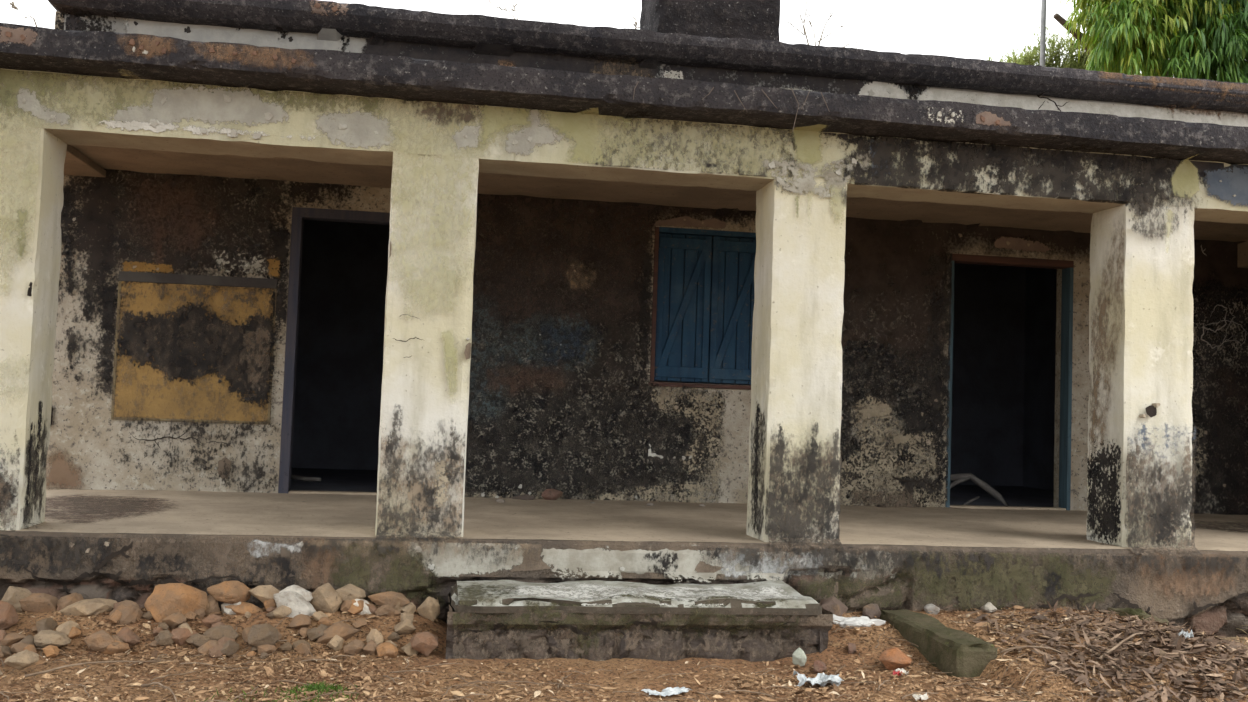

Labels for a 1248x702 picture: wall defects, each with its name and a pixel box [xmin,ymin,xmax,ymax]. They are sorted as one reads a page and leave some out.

peeling [15,88,70,125]
peeling [99,85,395,149]
crack [1037,92,1070,111]
leakage [0,401,122,575]
leakage [112,418,278,493]
peeling [115,251,280,420]
leakage [55,169,361,398]
leakage [299,193,756,605]
leakage [707,252,952,614]
leakage [819,132,1248,595]
leakage [609,594,786,625]